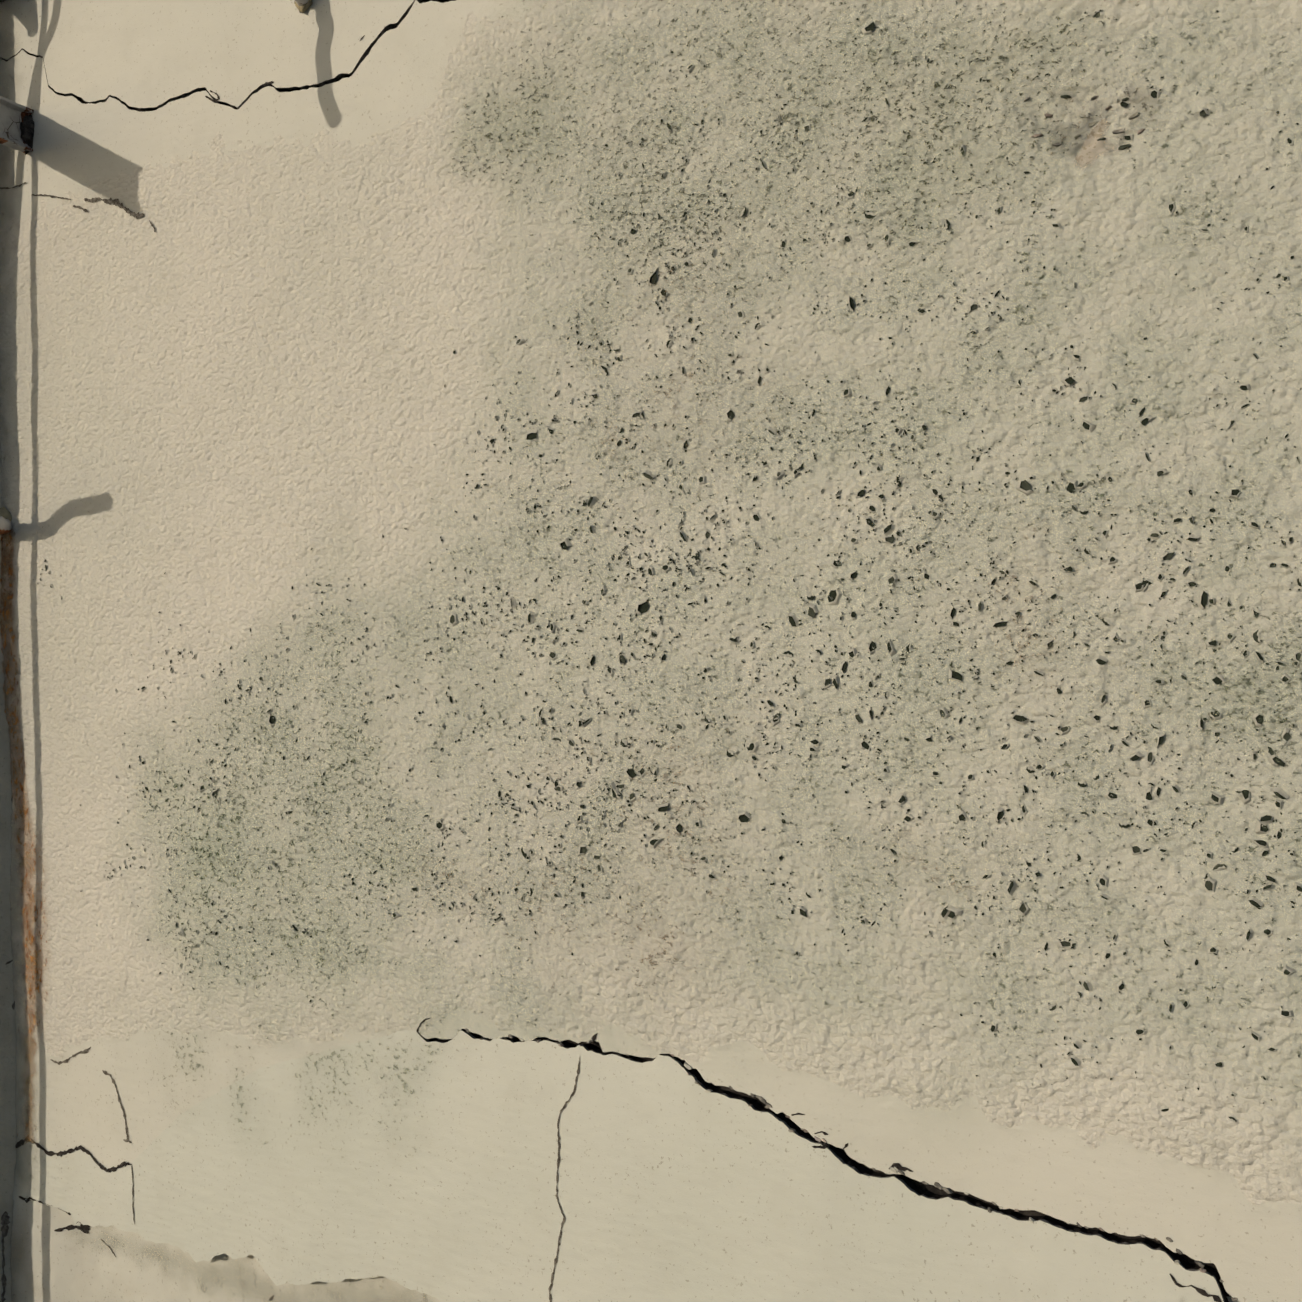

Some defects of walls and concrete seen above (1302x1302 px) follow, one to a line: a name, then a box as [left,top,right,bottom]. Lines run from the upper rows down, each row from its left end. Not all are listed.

crack [1,0,455,112]
damp [452,0,1153,285]
rust [0,535,47,1059]
mould [135,620,425,1033]
crack [1,1196,116,1302]
crack [15,1047,135,1224]
crack [416,1018,1238,1302]